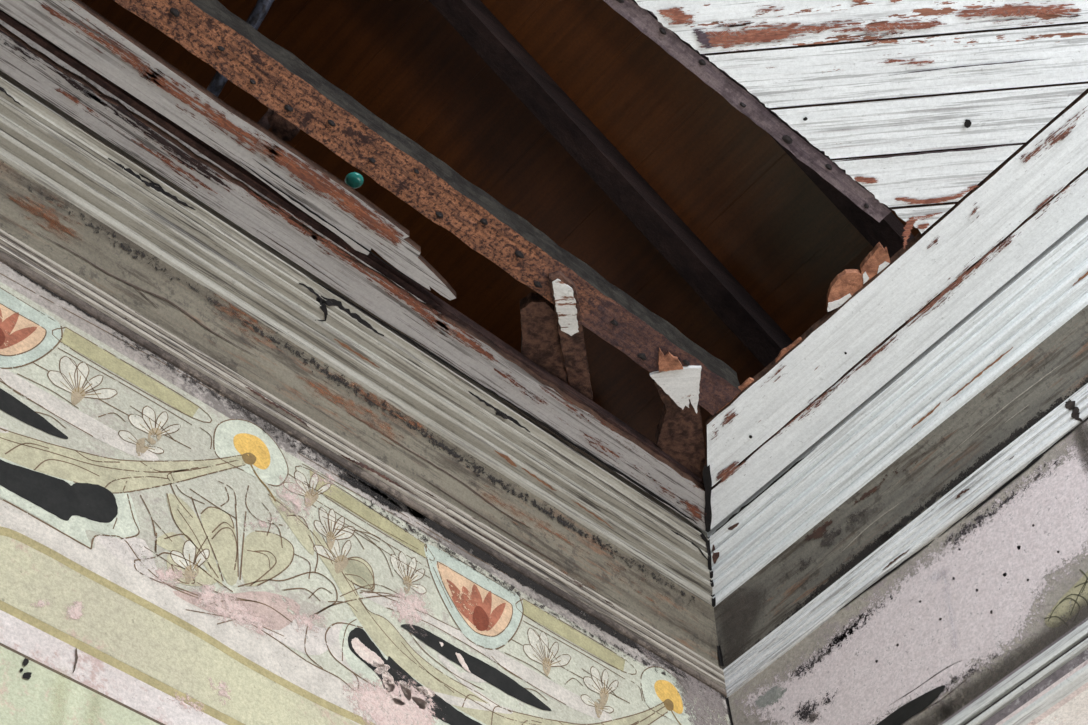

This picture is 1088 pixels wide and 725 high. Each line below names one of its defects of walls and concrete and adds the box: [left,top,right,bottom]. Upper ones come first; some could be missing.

peeling [657,5,945,51]
peeling [952,0,1081,26]
peeling [1020,106,1087,163]
peeling [0,3,633,464]
peeling [776,233,1020,435]
corrosion [298,374,430,443]
crack [252,227,816,607]
damp [722,377,1088,664]
peeling [343,638,438,725]
damp [792,688,838,724]
damp [784,593,894,680]
damp [914,602,1088,725]